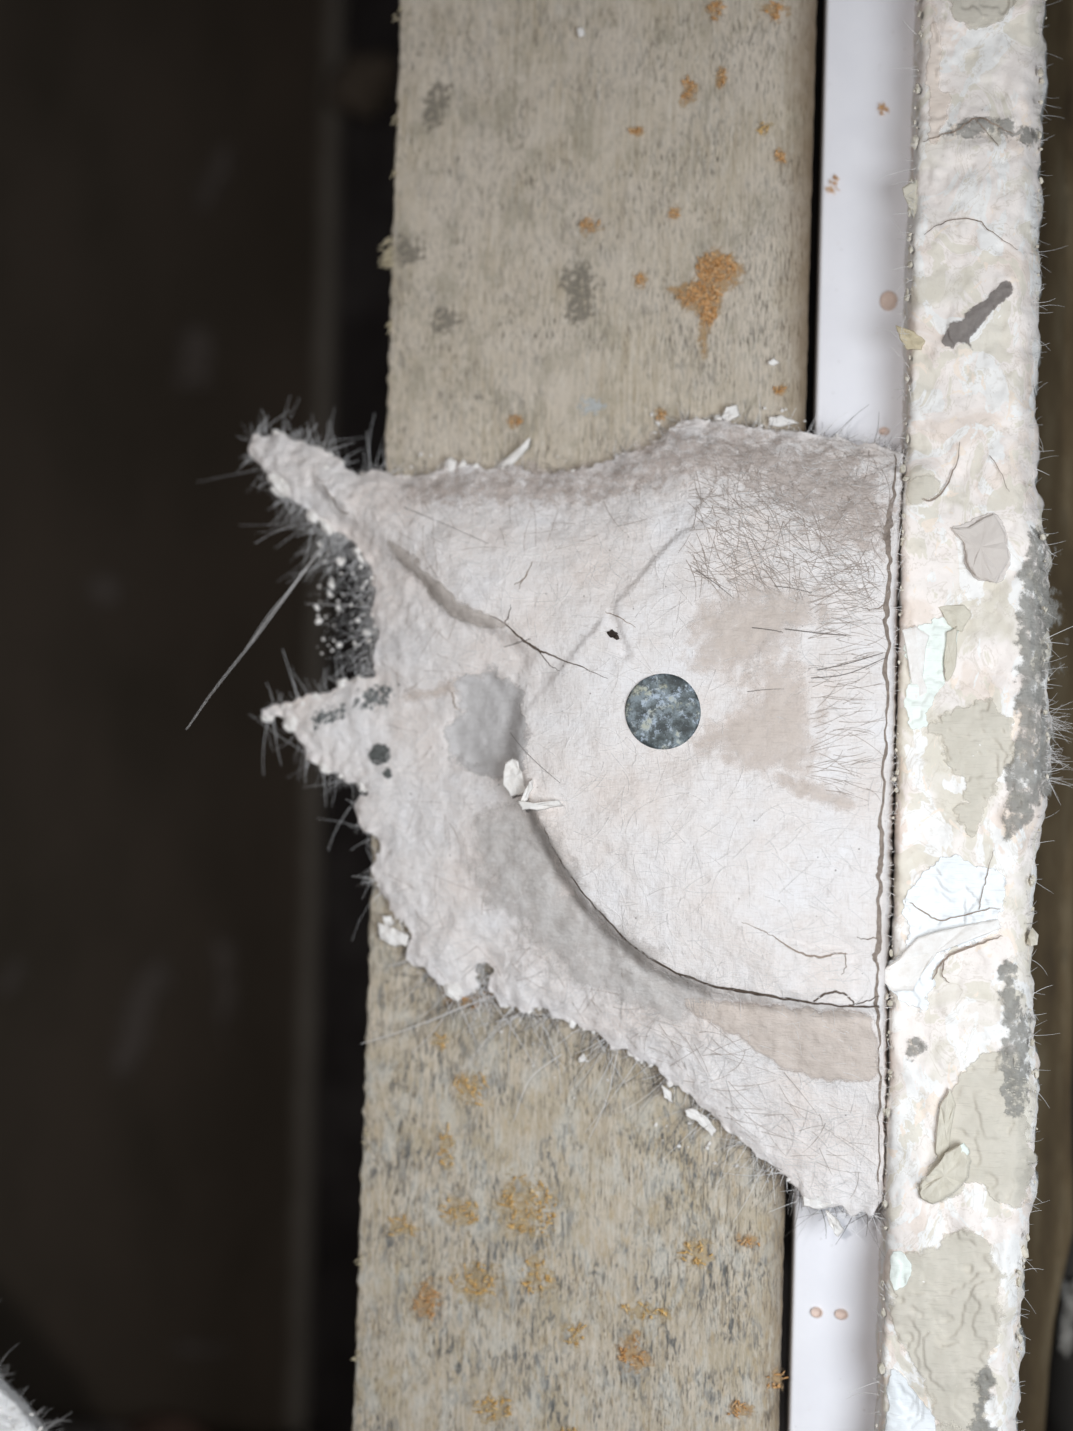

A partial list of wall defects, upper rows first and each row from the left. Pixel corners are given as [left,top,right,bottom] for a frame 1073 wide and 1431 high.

corrosion [668,249,743,354]
peeling [951,513,1011,583]
spalling [368,744,392,779]
spalling [443,666,712,1021]
crack [544,442,1007,1182]
peeling [902,605,1016,837]
peeling [378,916,409,947]
peeling [885,854,1007,1012]
flaking render [661,1085,716,1136]
peeling [917,1051,1037,1208]
spalling [0,1343,70,1431]
peeling [885,1229,1005,1431]